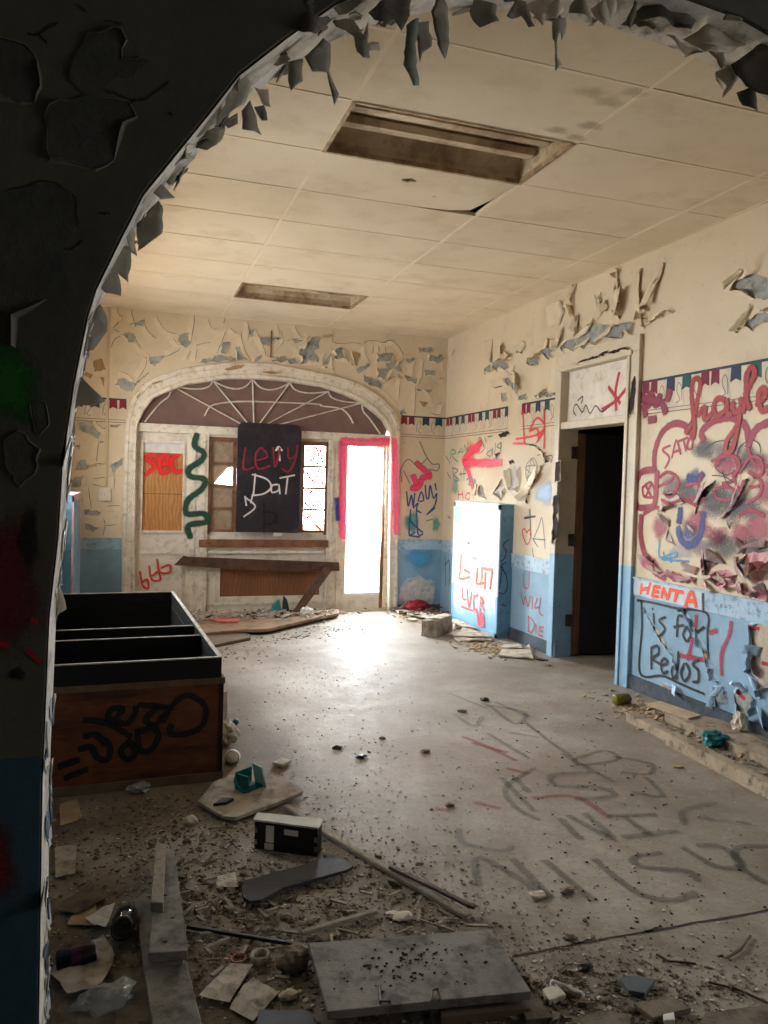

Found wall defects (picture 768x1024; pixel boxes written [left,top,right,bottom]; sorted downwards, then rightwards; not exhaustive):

peeling [62,0,768,504]
peeling [55,519,68,620]
peeling [474,430,561,544]
peeling [636,475,768,603]
peeling [677,607,768,730]